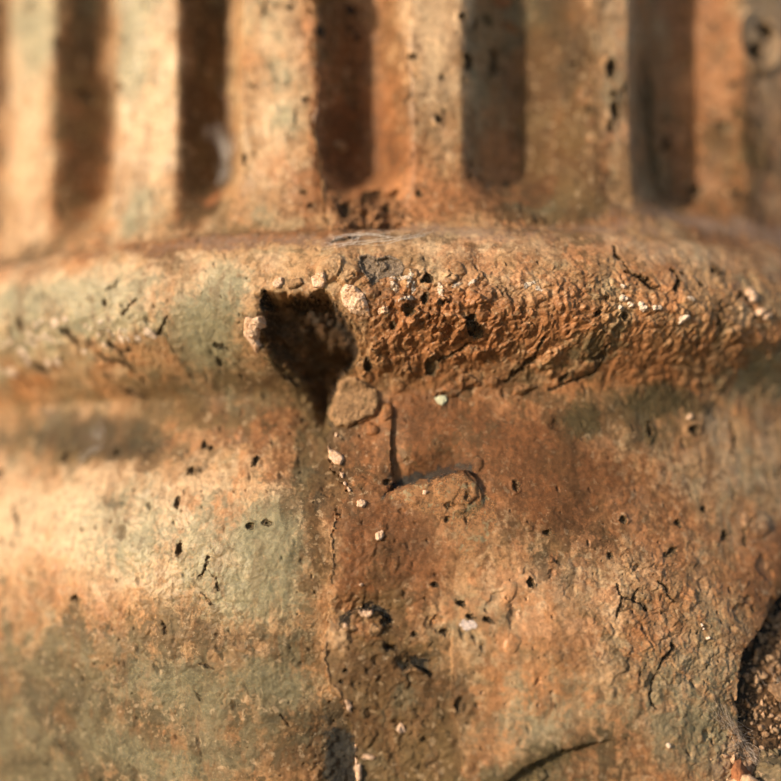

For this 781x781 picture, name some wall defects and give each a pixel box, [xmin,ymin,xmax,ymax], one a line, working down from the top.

spalling [331,188,406,243]
spalling [358,254,478,317]
crack [612,245,684,292]
spalling [244,272,397,437]
spalling [425,356,440,376]
crack [438,343,469,362]
crack [503,336,545,383]
crack [548,343,612,391]
peeling [433,391,450,406]
peeling [328,446,351,492]